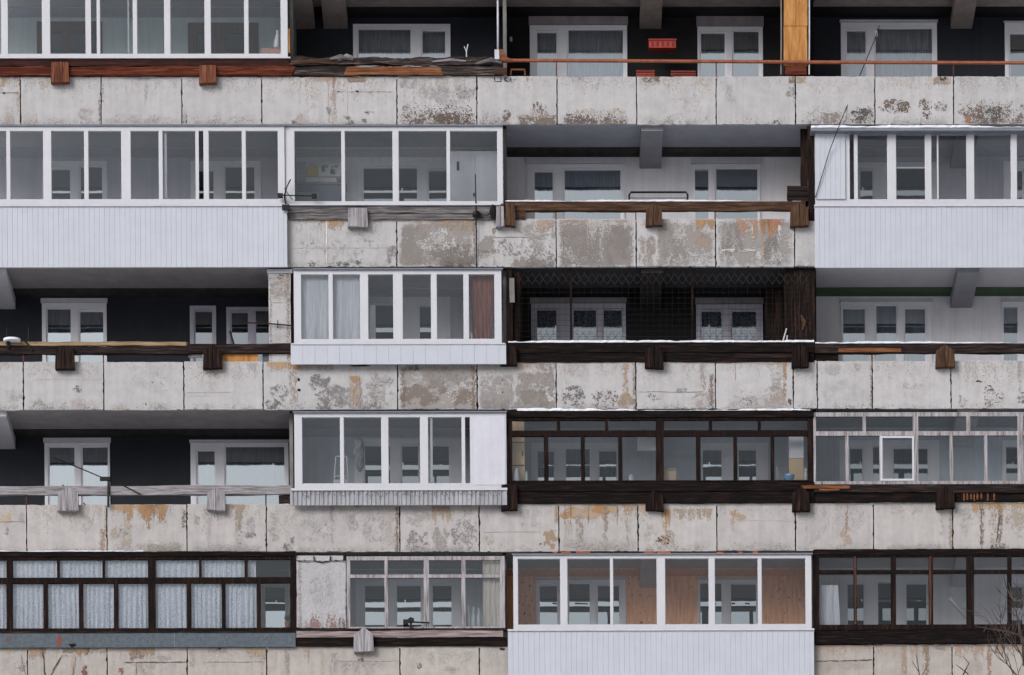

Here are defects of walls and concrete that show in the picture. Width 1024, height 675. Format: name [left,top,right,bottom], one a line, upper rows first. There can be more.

spalling [400,100,475,124]
spalling [503,102,628,124]
spalling [799,99,947,124]
spalling [963,98,1024,124]
rust [736,219,784,263]
rust [99,505,171,551]
rust [543,503,746,549]
rust [835,503,854,548]
rust [971,503,1024,549]